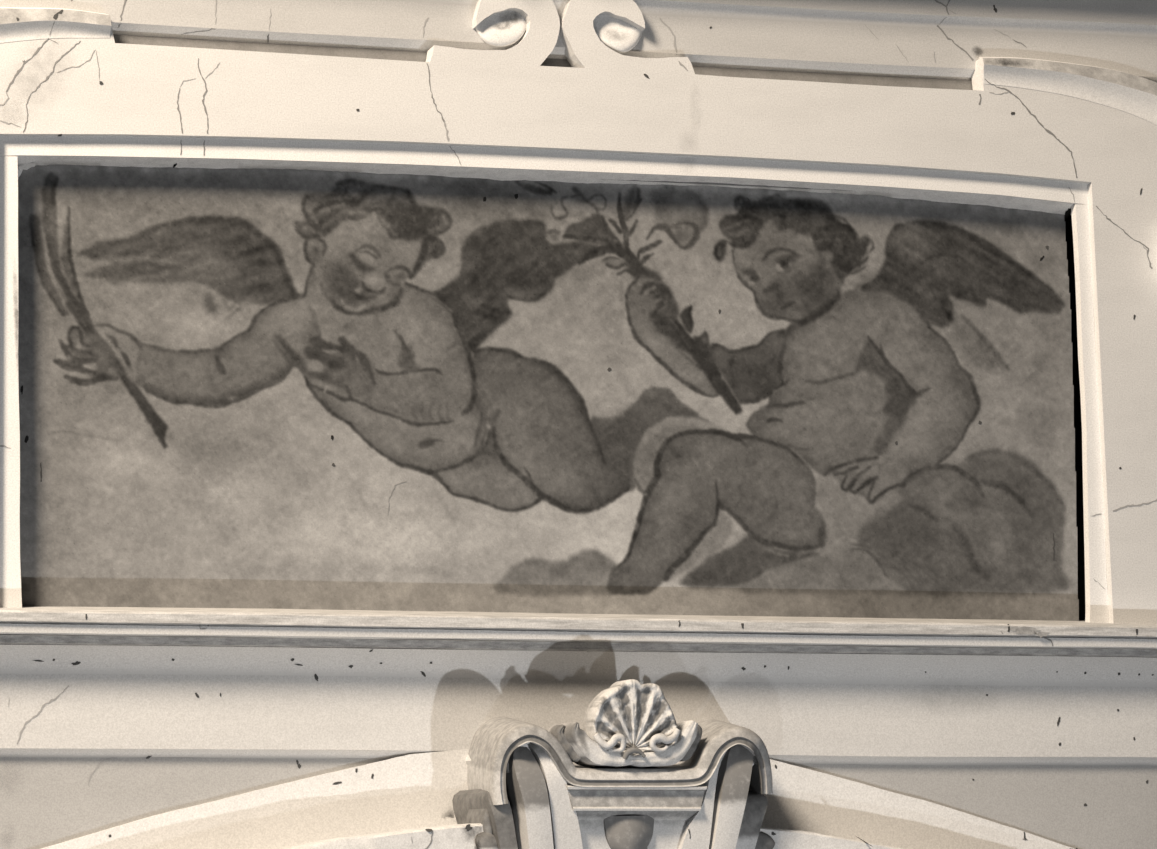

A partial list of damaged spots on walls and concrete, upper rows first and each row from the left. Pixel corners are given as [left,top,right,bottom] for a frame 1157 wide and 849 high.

crack [0,0,100,132]
crack [177,0,220,155]
crack [423,18,461,164]
crack [865,0,1152,269]
crack [1093,499,1157,516]
crack [8,685,69,744]